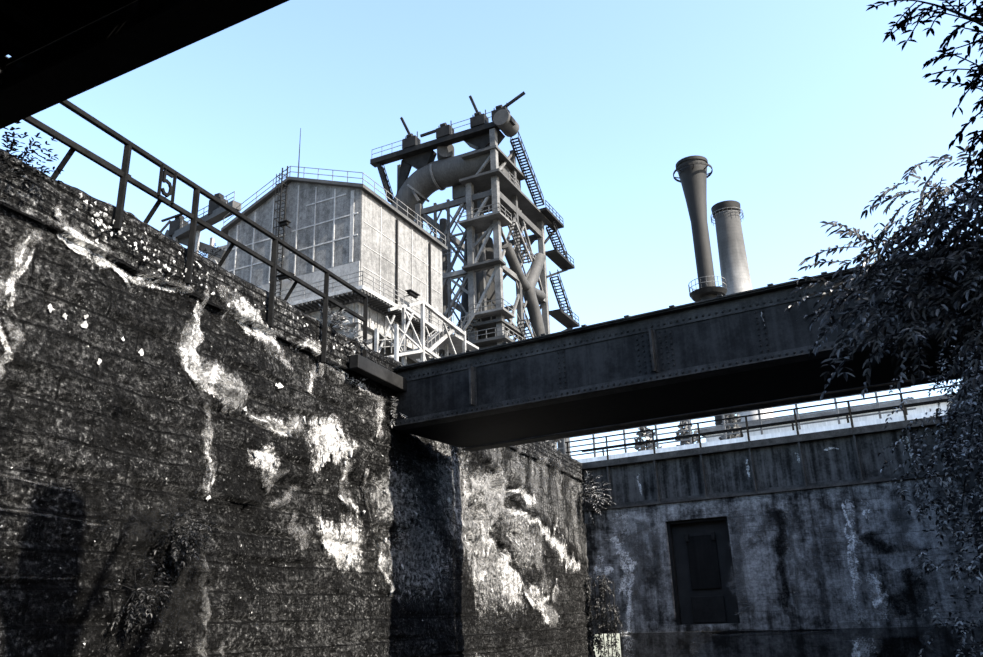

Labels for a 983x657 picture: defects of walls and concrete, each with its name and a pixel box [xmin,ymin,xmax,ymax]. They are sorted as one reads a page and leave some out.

damp [0,230,41,307]
damp [0,323,22,379]
damp [202,406,215,491]
damp [728,509,801,616]
damp [810,500,939,657]